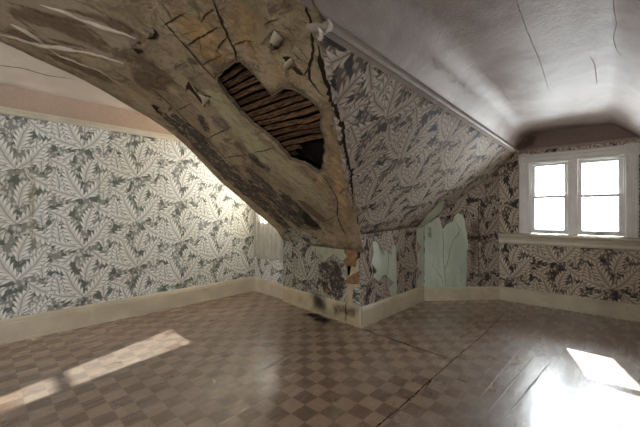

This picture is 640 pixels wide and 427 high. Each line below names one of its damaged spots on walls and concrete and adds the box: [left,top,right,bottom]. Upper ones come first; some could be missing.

crack [150,1,324,97]
spalling [267,29,284,51]
spalling [283,56,303,75]
crack [516,0,549,90]
crack [152,89,276,195]
spalling [216,61,326,173]
crack [293,176,348,240]
damp [307,260,355,323]